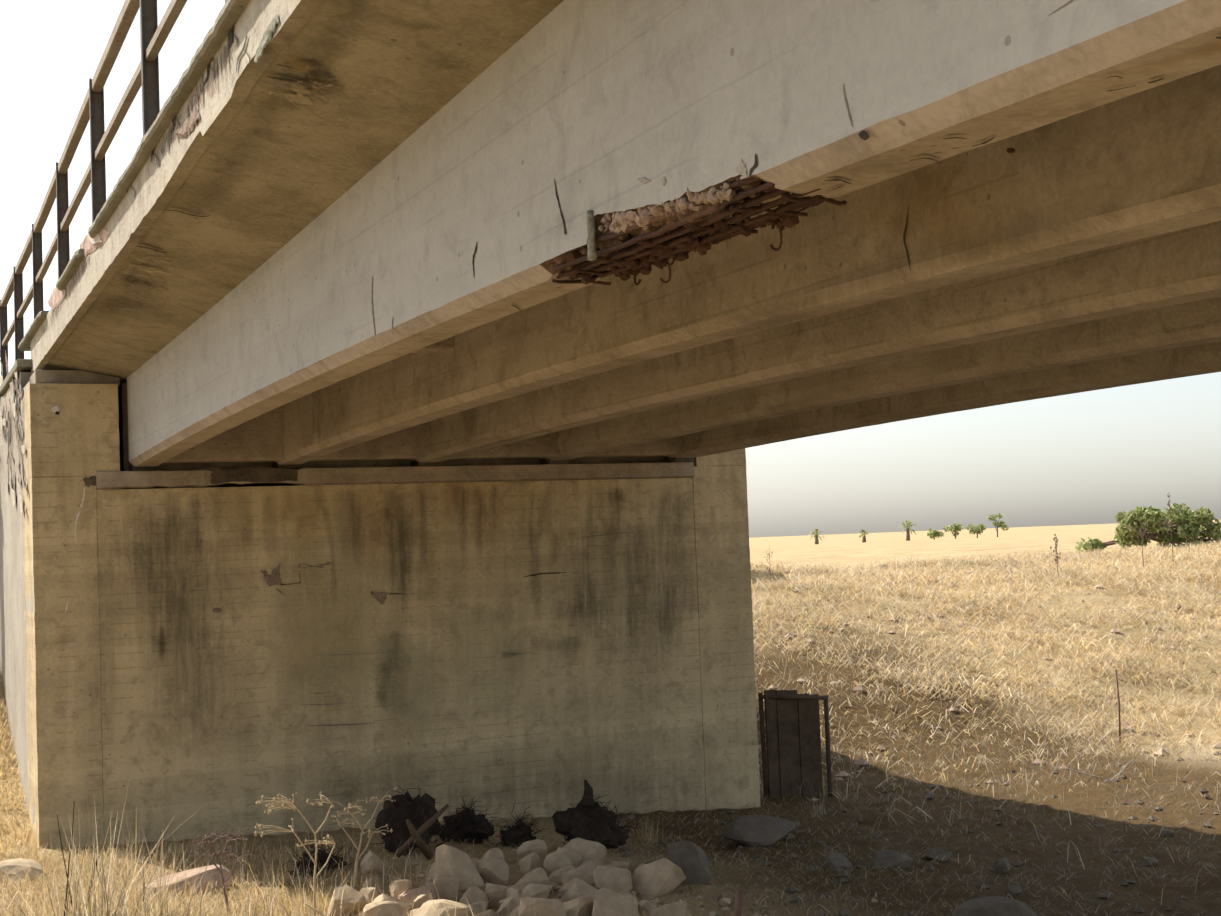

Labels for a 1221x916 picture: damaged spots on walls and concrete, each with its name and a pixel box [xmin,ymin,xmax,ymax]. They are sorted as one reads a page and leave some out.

spalling [552,153,847,285]